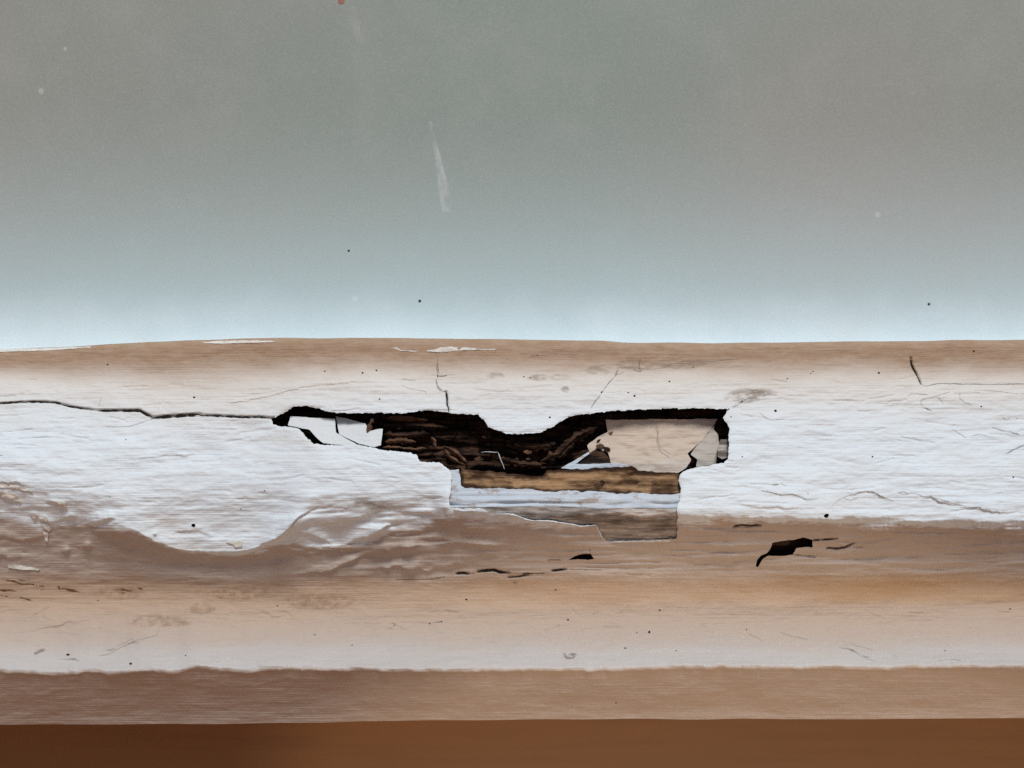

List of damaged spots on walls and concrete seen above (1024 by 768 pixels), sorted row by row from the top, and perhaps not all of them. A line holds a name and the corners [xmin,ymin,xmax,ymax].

crack [0,399,268,427]
peeling [288,416,383,447]
crack [401,370,449,413]
peeling [562,419,719,473]
crack [908,359,1021,411]
peeling [449,469,680,543]